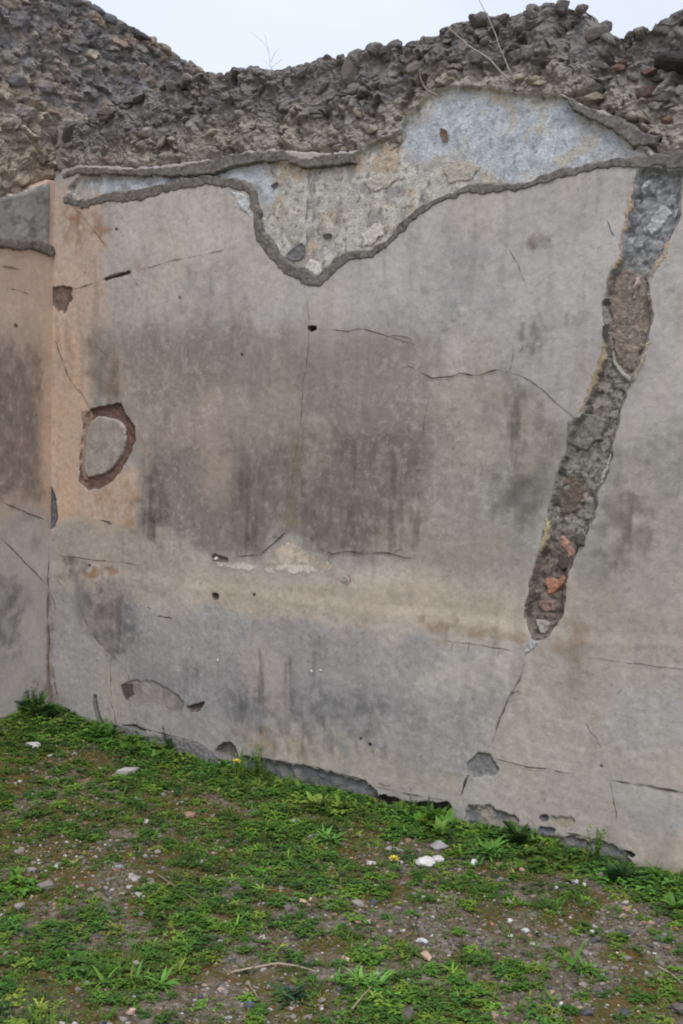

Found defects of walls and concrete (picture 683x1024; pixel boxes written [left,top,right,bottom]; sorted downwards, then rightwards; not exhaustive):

peeling [67,174,196,200]
peeling [211,83,683,655]
crack [336,329,573,417]
spalling [78,403,136,490]
crack [317,548,412,562]
crack [0,538,132,697]
peeling [93,694,220,763]
crack [495,676,521,731]
peeling [233,755,388,806]
crack [498,759,560,772]
crack [610,779,683,818]
peeling [463,804,632,865]